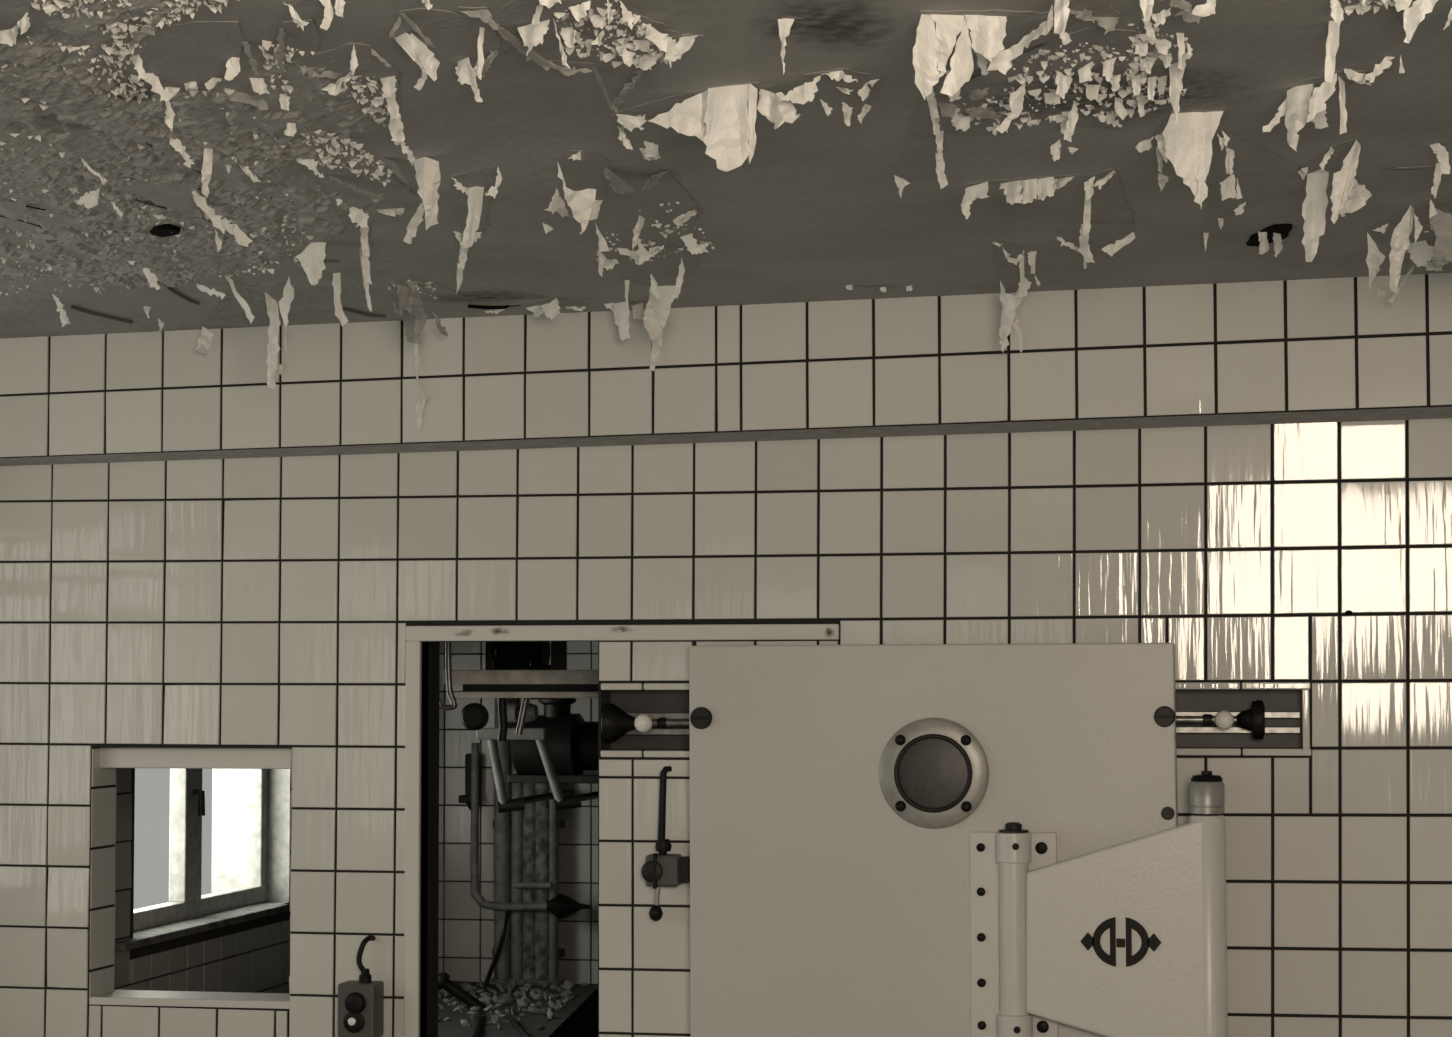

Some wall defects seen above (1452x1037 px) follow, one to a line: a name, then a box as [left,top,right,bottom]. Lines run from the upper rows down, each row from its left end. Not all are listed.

peeling [0,0,885,433]
peeling [991,241,1040,352]
peeling [893,0,1452,269]
peeling [1363,143,1452,303]